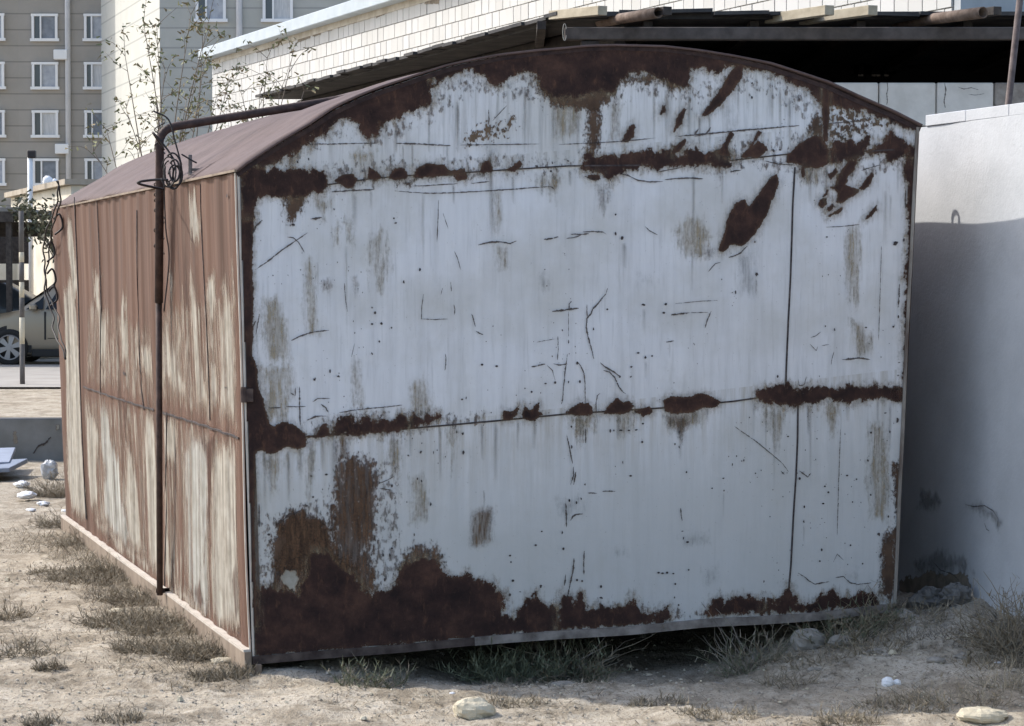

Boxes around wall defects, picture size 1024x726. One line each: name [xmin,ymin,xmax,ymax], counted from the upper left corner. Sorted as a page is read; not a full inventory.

rust [240,50,915,656]
rust [204,441,213,512]
peeling [280,570,299,591]